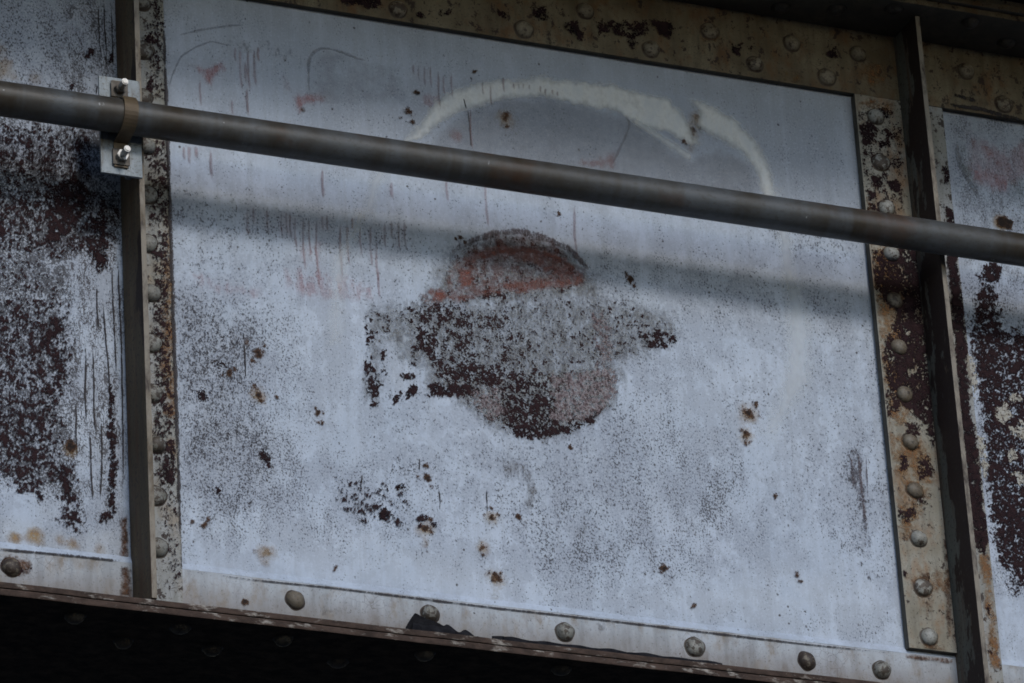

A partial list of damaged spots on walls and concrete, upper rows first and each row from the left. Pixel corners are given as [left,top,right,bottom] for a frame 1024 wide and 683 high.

rust [995,216,1014,230]
rust [64,439,77,452]
rust [739,401,760,446]
rust [912,545,952,637]